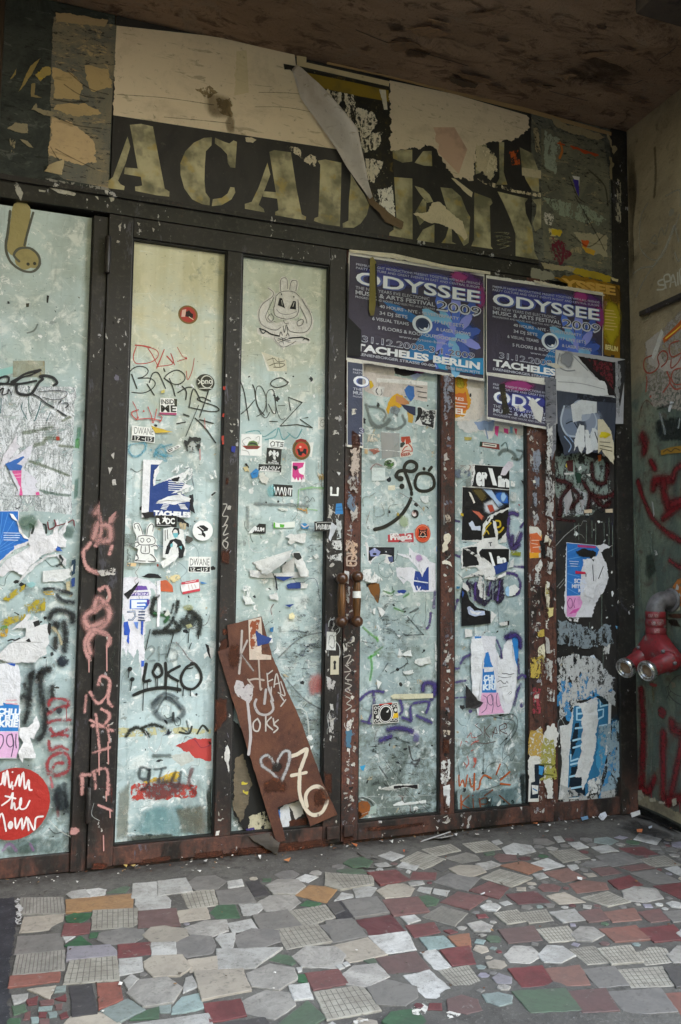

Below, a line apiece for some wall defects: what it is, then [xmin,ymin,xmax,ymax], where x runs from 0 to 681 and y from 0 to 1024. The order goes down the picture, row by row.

rust [214,699,227,732]
rust [195,838,328,859]